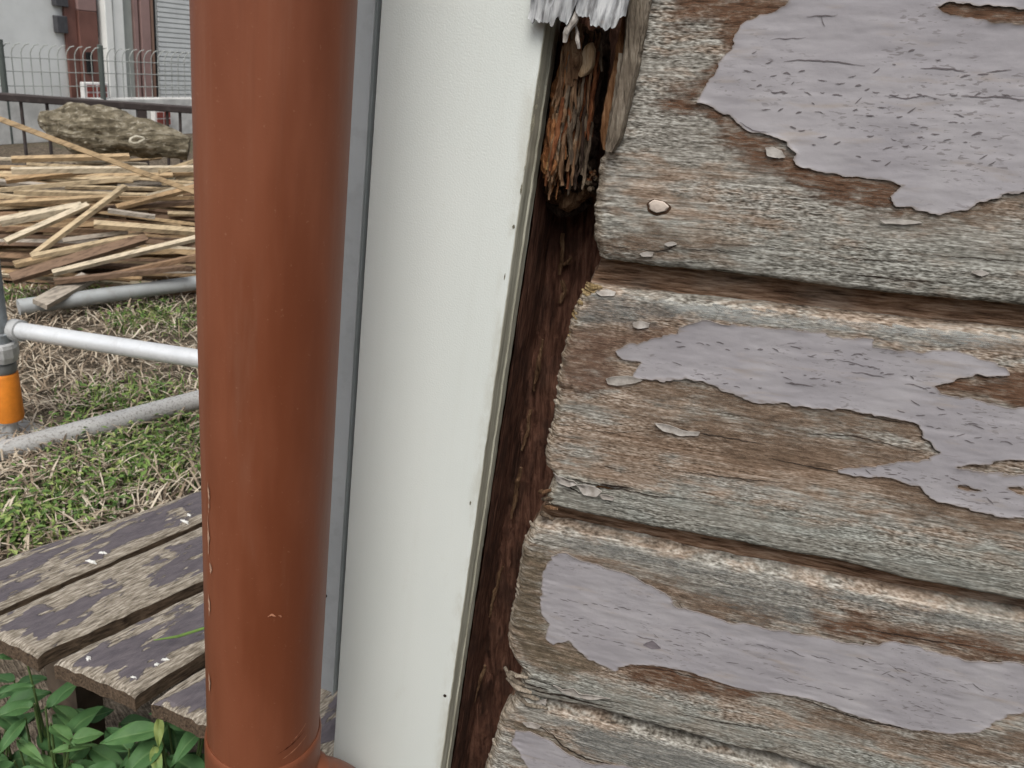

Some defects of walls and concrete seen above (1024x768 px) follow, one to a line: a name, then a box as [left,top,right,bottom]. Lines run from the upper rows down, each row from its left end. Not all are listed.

peeling [578,43,596,77]
peeling [697,0,1024,225]
peeling [554,473,614,501]
peeling [606,320,1024,518]
peeling [540,553,1024,734]